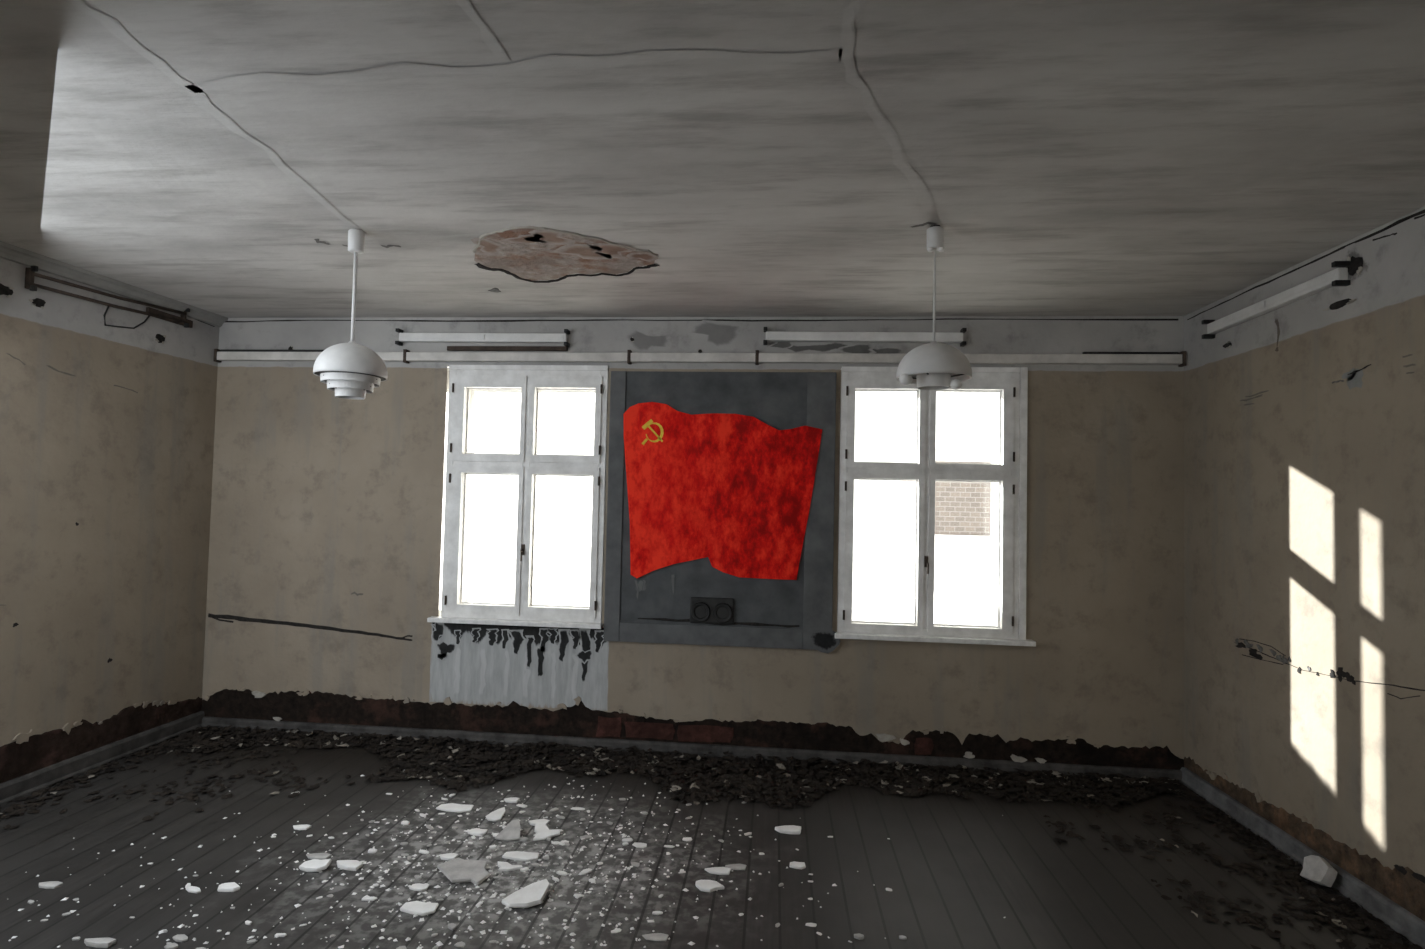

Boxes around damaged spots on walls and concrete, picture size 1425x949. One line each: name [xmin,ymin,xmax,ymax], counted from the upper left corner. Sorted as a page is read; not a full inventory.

peeling [471,226,659,293]
crack [208,613,413,641]
crack [1235,639,1425,699]
peeling [0,688,1425,922]